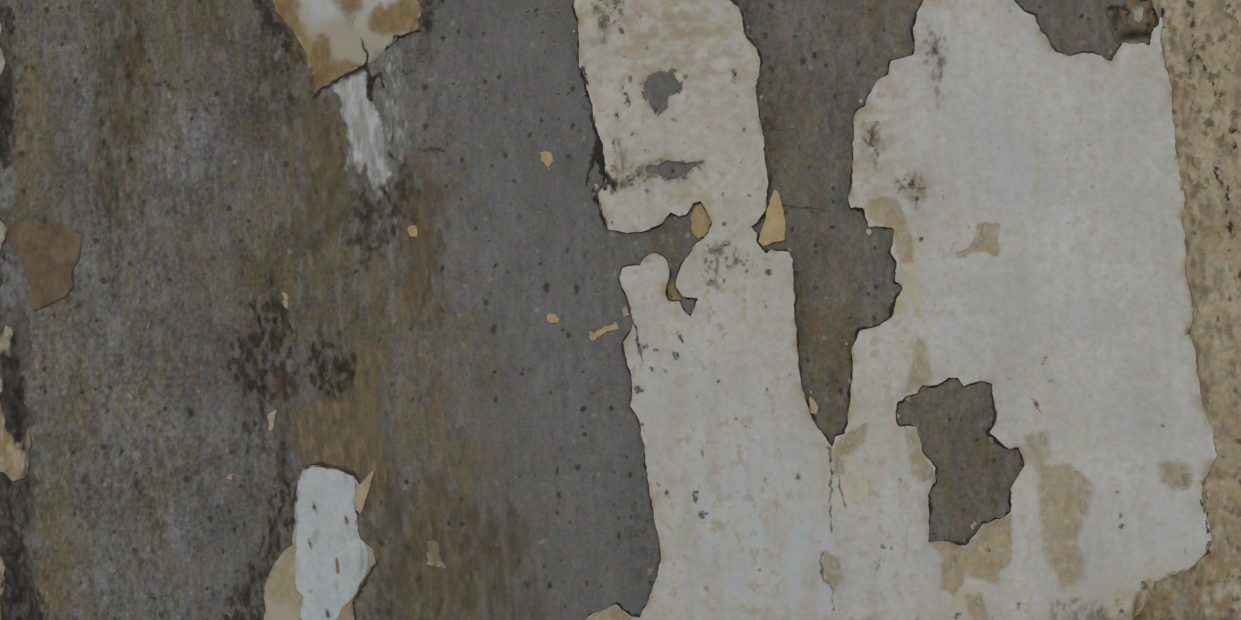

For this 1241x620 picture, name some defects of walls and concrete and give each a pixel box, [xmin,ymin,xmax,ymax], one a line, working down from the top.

leakage [224,299,399,620]
peeling [0,0,725,620]
peeling [730,0,924,473]
peeling [895,378,1045,594]
peeling [1014,0,1241,620]